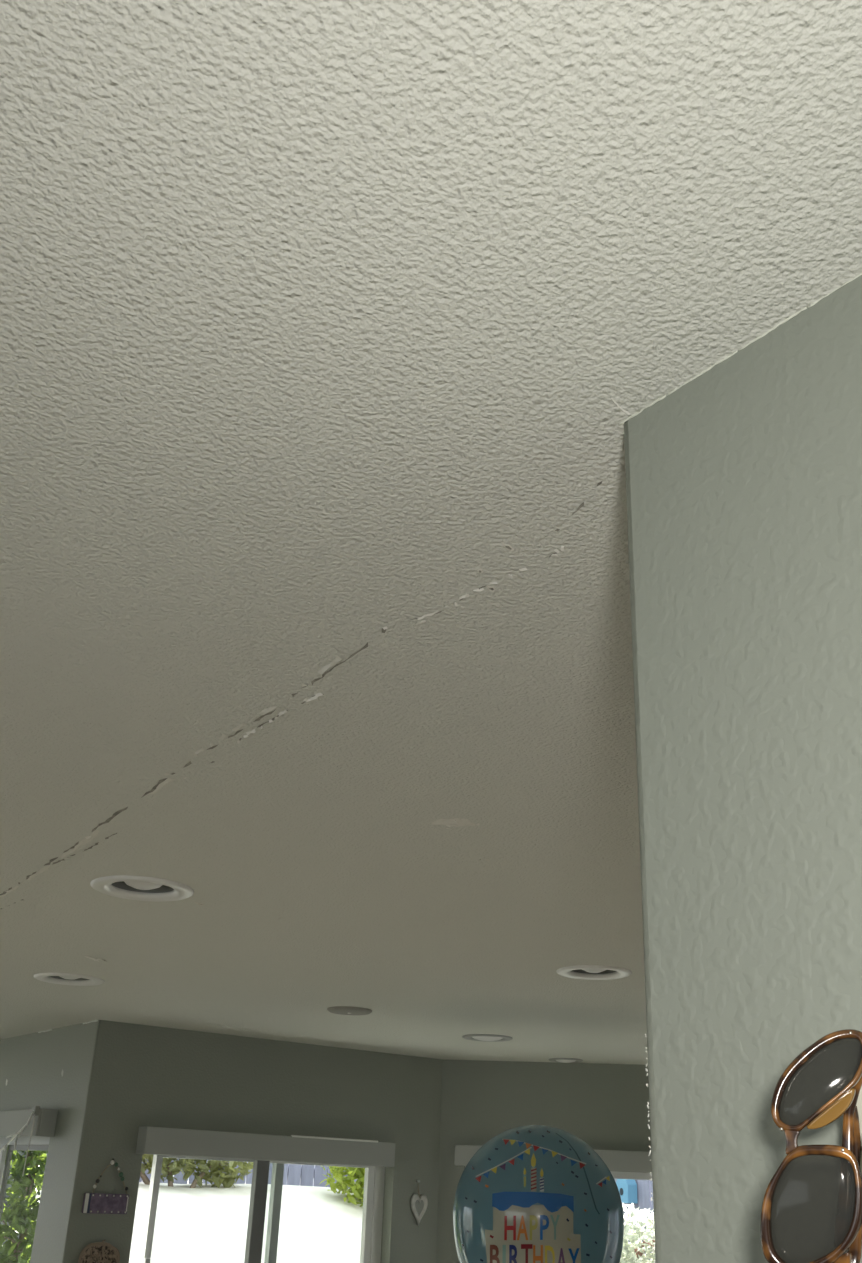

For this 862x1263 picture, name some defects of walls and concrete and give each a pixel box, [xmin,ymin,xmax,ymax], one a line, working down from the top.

crack [0,481,602,909]